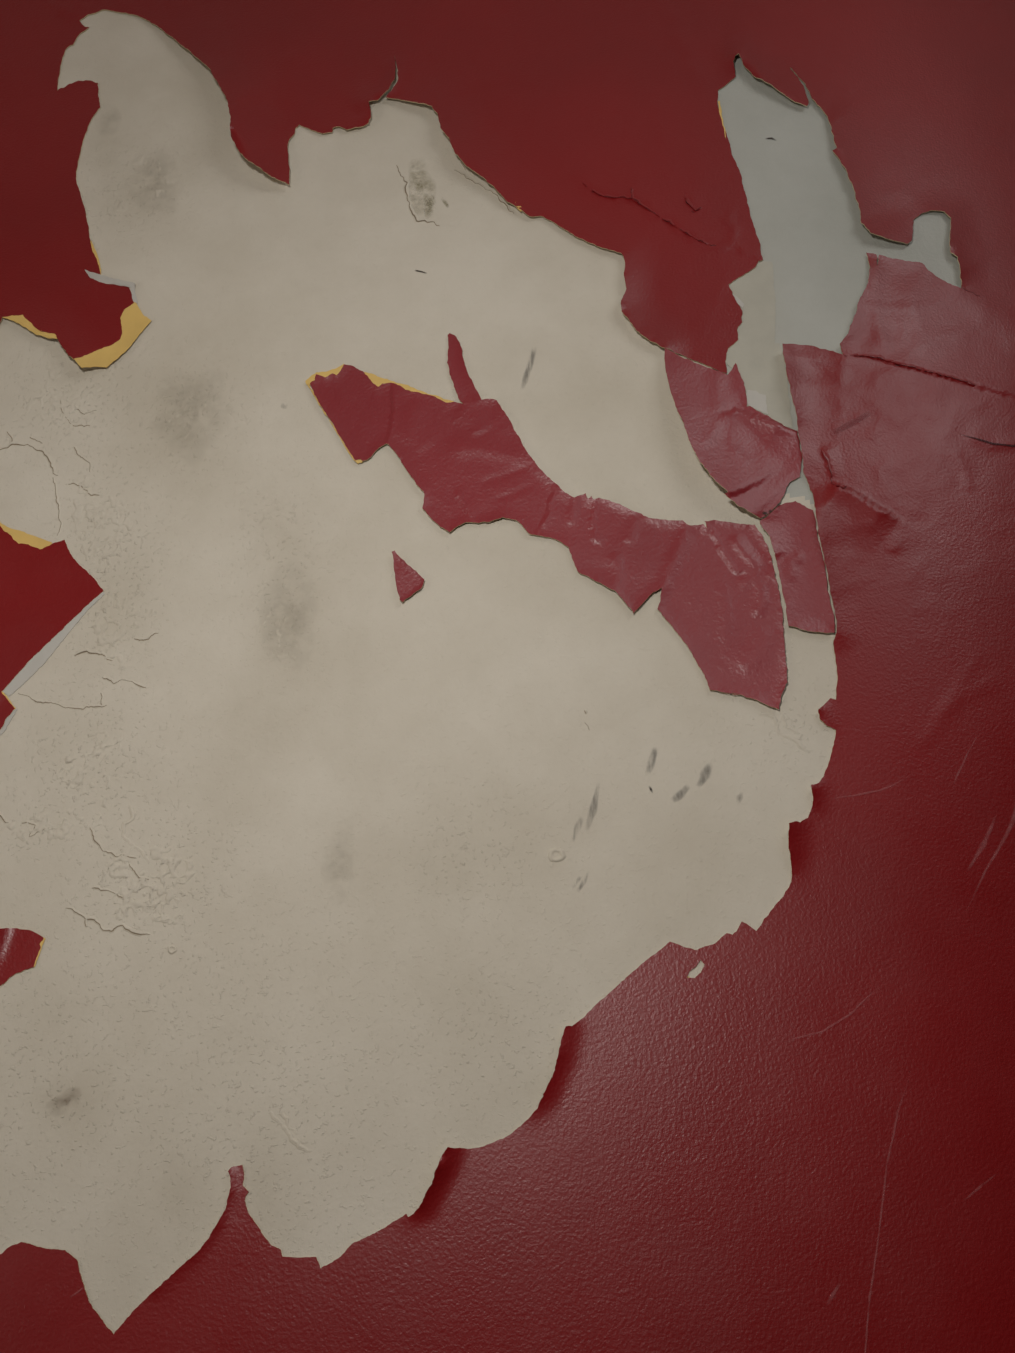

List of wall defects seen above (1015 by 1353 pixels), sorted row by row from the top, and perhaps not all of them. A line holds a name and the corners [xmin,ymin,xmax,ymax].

crack [582,182,716,247]
peeling [717,54,961,431]
peeling [74,302,151,370]
crack [844,354,975,386]
crack [0,400,101,536]
peeling [664,348,802,519]
flaking render [70,495,133,574]
peeling [305,364,787,710]
peeling [2,592,105,696]
crack [18,632,159,711]
crack [0,812,49,837]
crack [66,826,150,937]